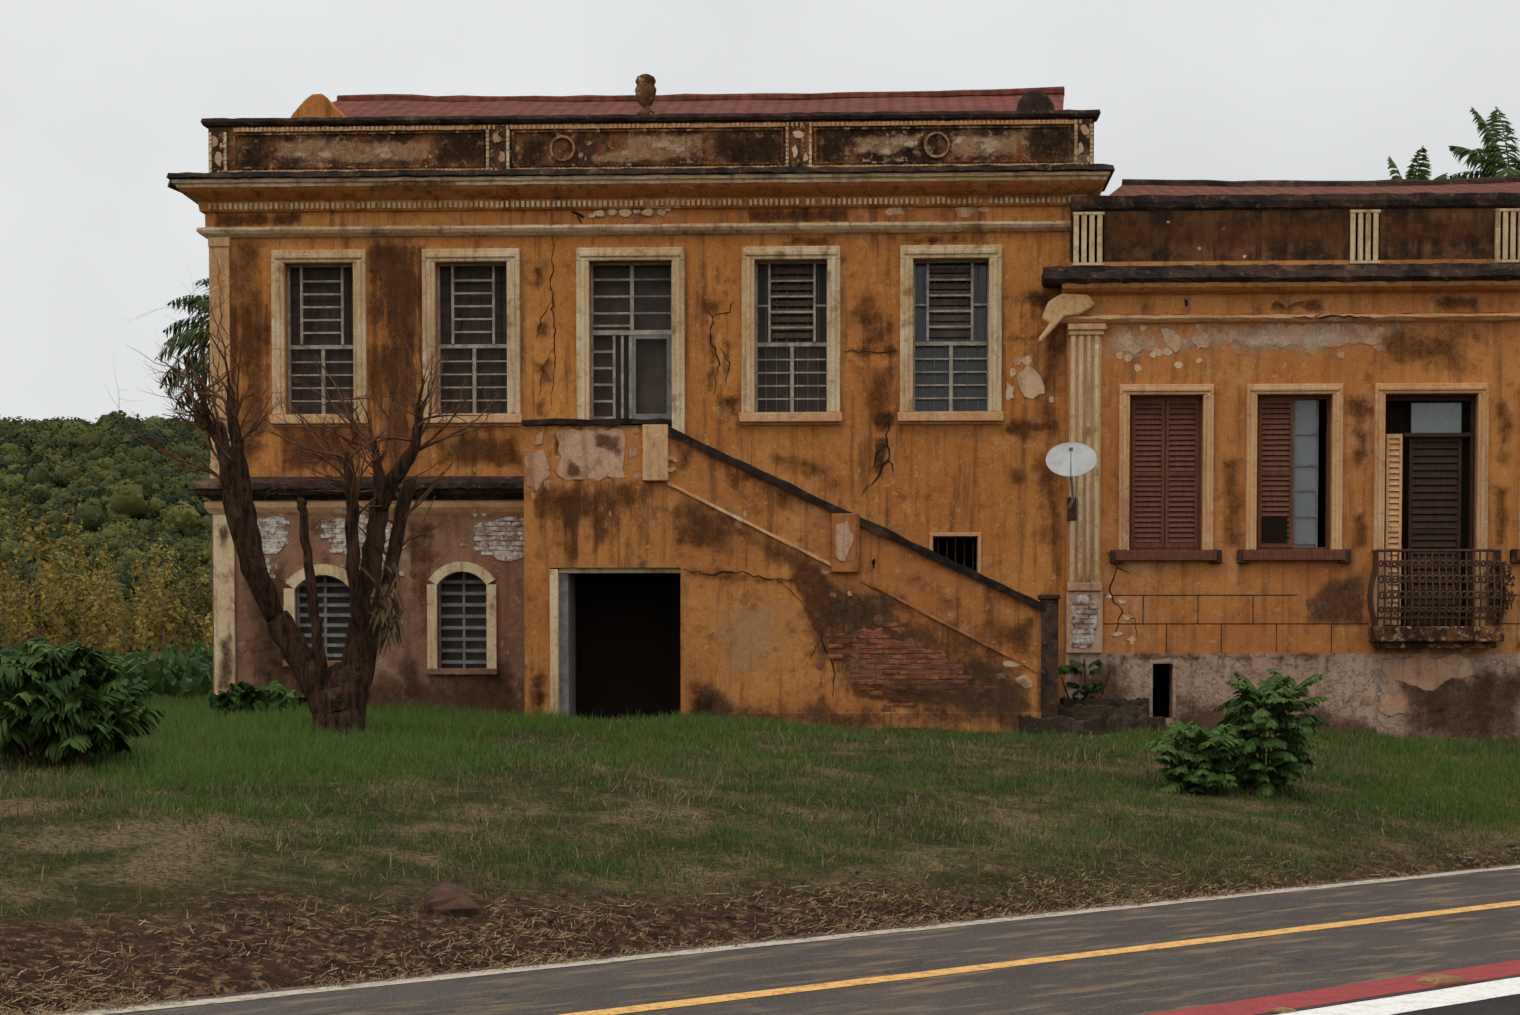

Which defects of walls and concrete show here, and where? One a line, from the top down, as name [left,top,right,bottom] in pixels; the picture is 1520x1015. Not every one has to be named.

water stain [714,134,779,162]
crack [536,211,584,406]
flaking render [1106,322,1399,372]
flaking render [1005,355,1054,403]
flaking render [524,427,642,499]
flaking render [257,514,290,586]
flaking render [321,515,369,570]
flaking render [382,519,408,578]
flaking render [460,513,524,563]
flaking render [820,518,855,575]
flaking render [816,615,1033,712]
water stain [1403,673,1520,739]